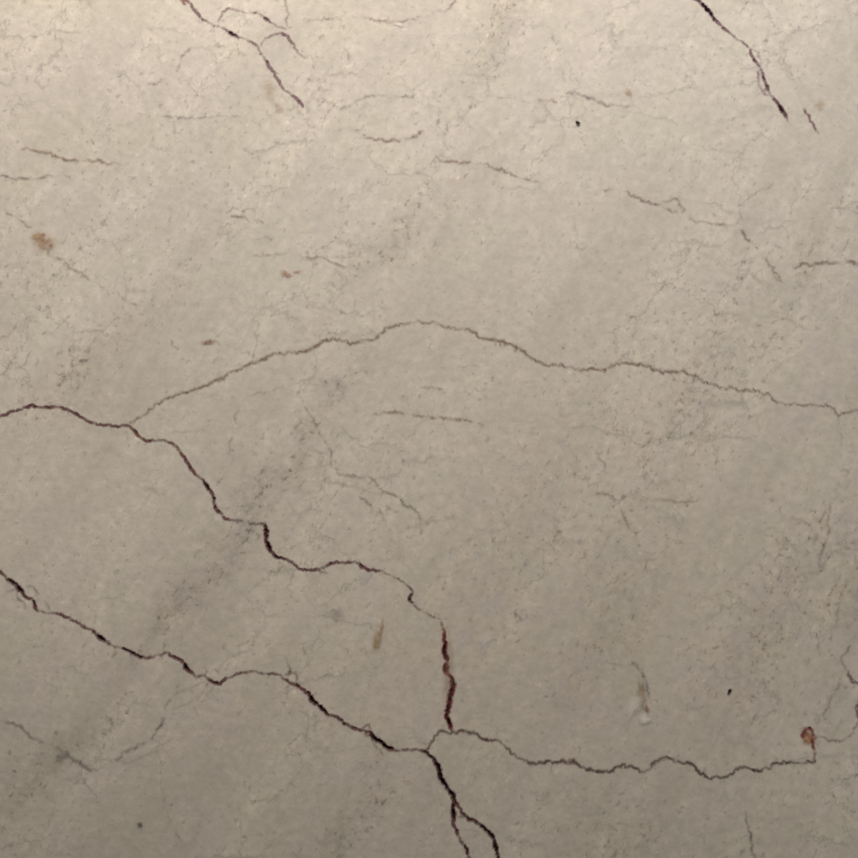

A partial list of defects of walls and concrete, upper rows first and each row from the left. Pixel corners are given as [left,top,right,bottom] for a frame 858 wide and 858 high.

crack [182,0,206,21]
crack [225,7,304,107]
crack [695,0,816,130]
crack [296,324,400,354]
crack [470,330,606,371]
crack [167,356,267,399]
crack [0,403,230,521]
crack [251,523,380,572]
crack [0,570,110,645]
crack [132,628,816,858]
corrosion [801,726,816,743]